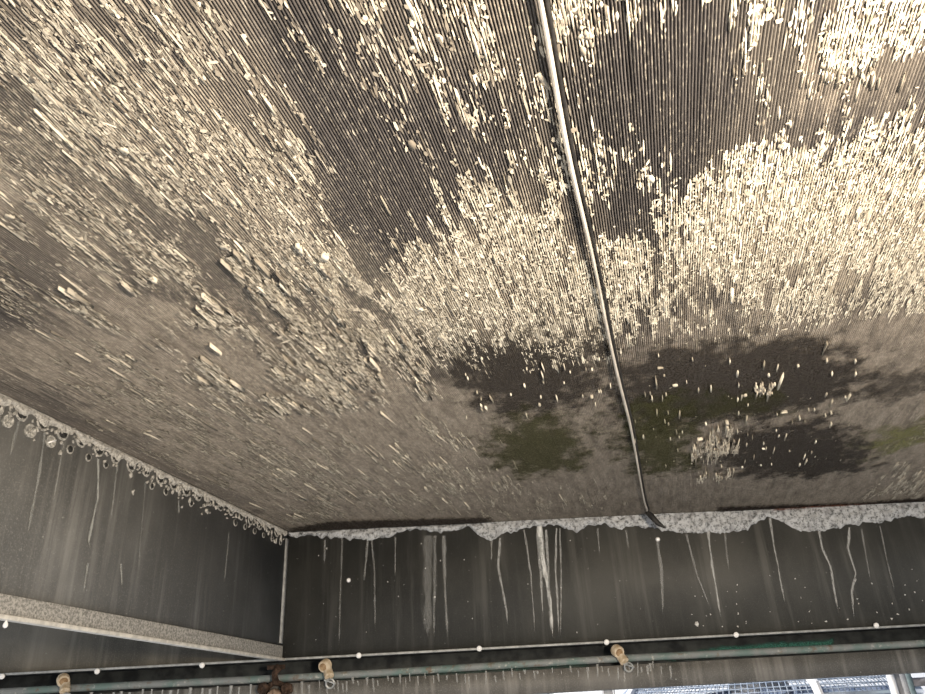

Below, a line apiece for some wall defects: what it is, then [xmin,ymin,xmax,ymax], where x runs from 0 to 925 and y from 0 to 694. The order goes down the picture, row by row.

peeling [0,0,925,544]
leakage [0,393,925,633]
leakage [416,321,925,481]